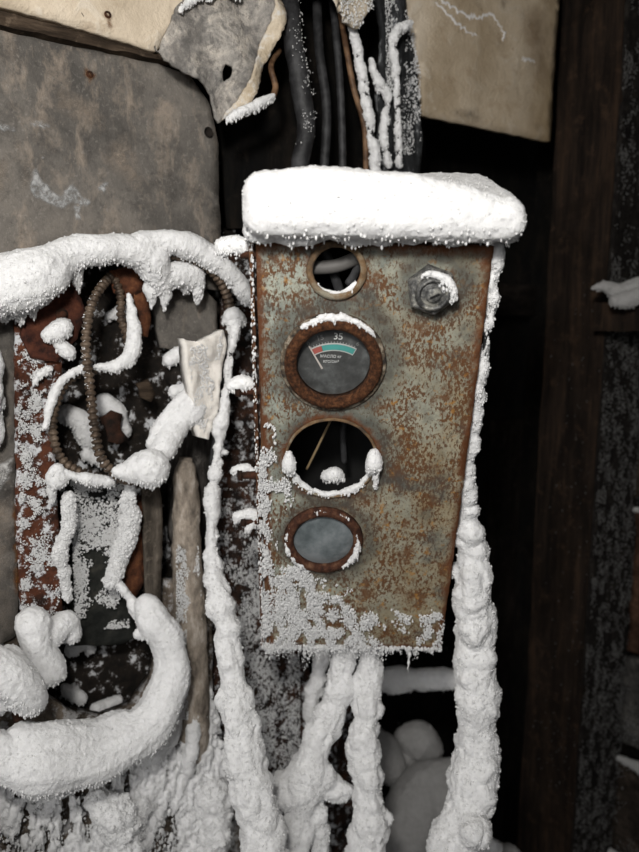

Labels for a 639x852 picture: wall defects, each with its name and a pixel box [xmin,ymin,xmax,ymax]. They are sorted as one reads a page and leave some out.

peeling [154,0,287,124]
rust [109,267,151,337]
rust [100,410,128,445]